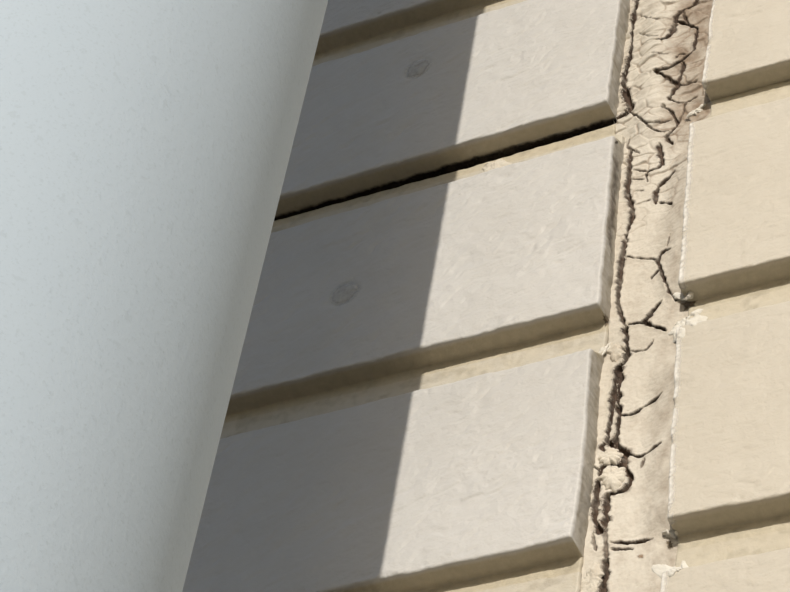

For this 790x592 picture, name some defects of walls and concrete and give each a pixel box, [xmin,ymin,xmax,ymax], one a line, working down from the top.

crack [274,0,699,592]